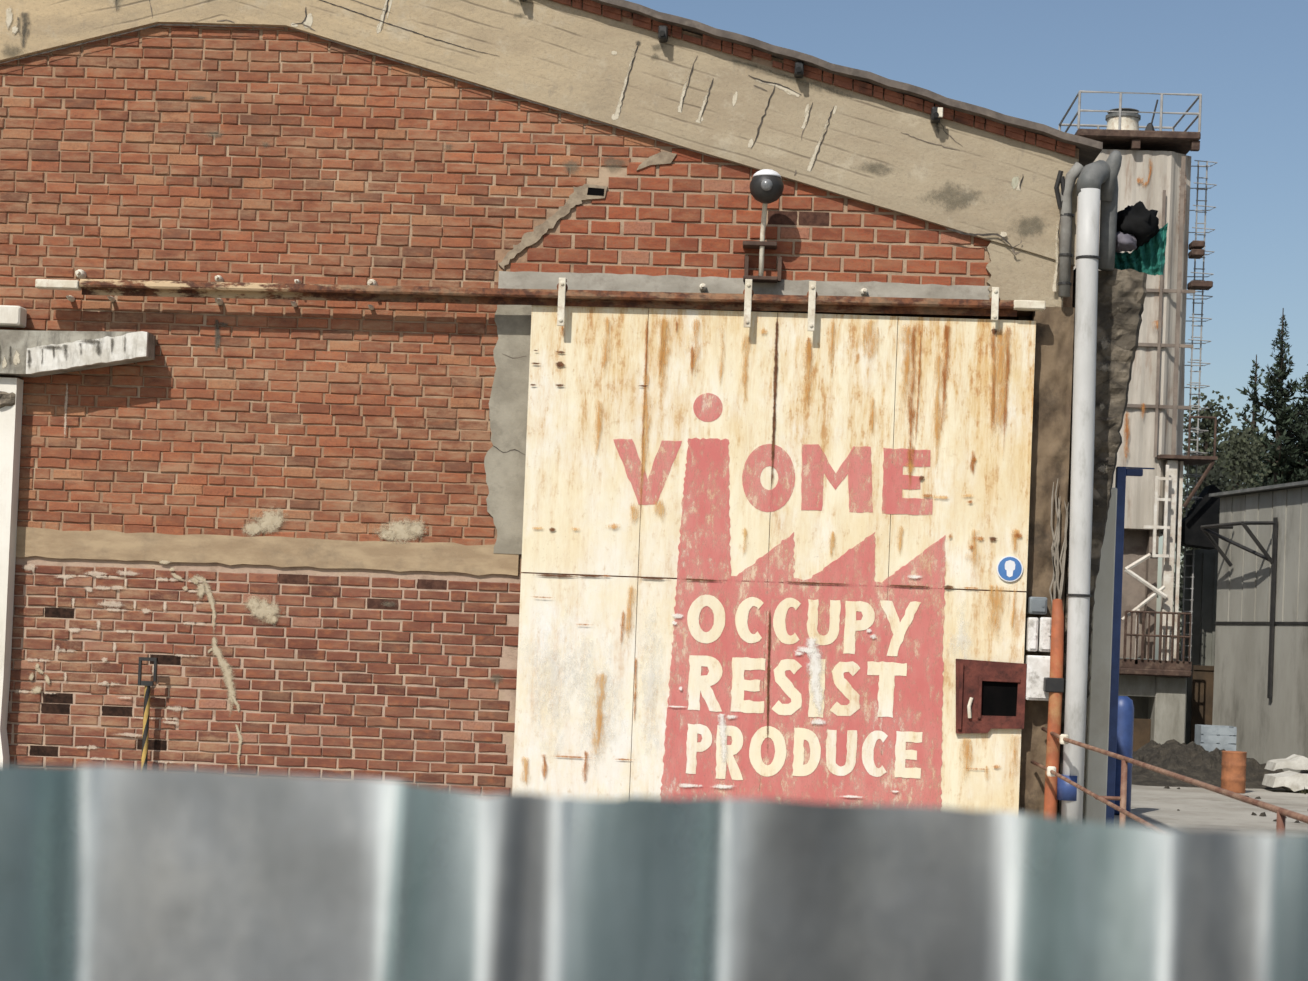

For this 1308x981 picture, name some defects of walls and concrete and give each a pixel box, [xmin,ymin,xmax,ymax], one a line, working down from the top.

crack [0,0,837,176]
hole [585,184,607,200]
corrosion [631,319,678,519]
corrosion [691,320,700,369]
corrosion [742,321,778,481]
corrosion [863,320,875,357]
corrosion [903,327,947,499]
corrosion [935,325,950,445]
corrosion [991,327,1011,433]
corrosion [970,530,997,561]
corrosion [620,577,663,640]
corrosion [890,585,1015,626]